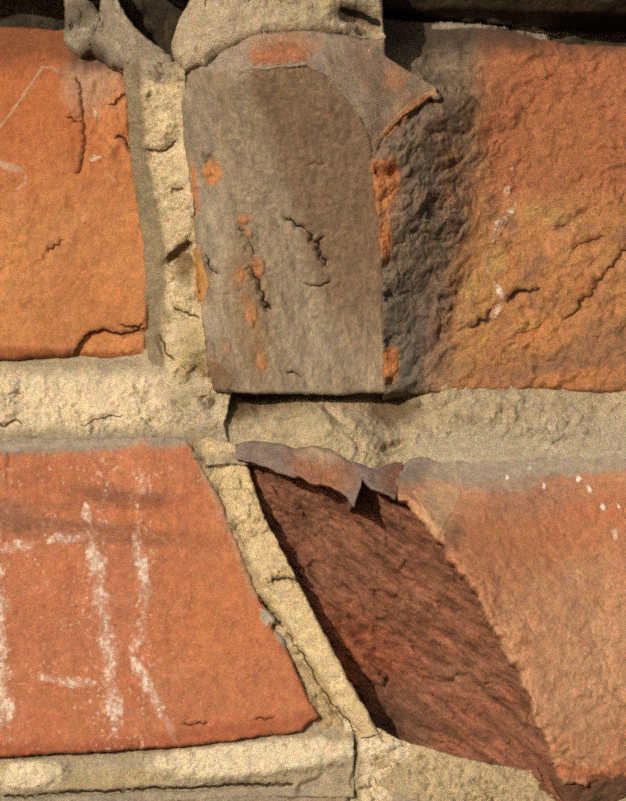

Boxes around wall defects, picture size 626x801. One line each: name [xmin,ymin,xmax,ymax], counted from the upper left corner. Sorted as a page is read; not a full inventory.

spalling [382,0,626,32]
crack [114,135,176,152]
crack [174,306,200,319]
crack [74,323,175,361]
spalling [235,441,562,801]